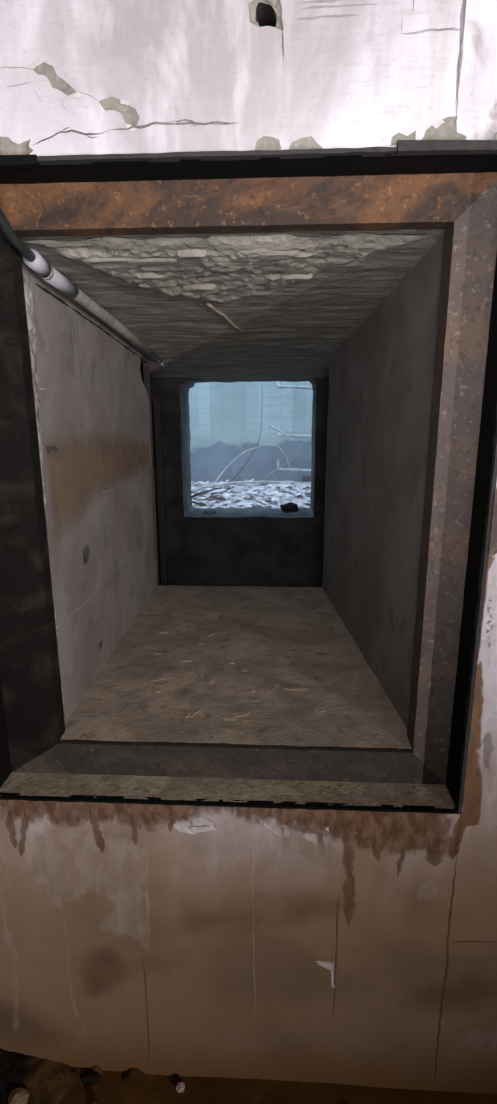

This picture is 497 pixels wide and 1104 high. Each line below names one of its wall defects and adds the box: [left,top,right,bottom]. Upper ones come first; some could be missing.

spalling [248,0,283,30]
peeling [28,58,83,98]
peeling [99,97,140,131]
spalling [0,136,33,155]
crack [34,119,239,145]
spalling [390,116,466,146]
rust [1,662,484,926]